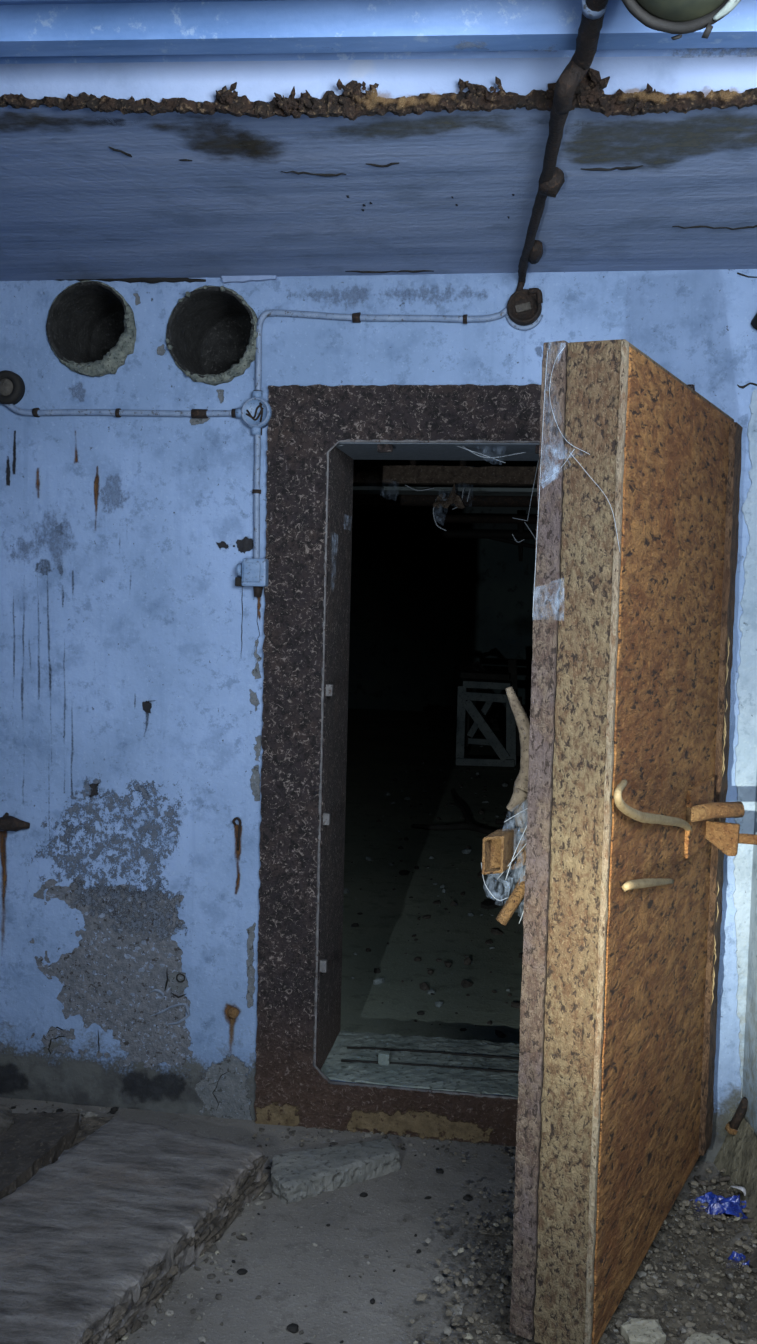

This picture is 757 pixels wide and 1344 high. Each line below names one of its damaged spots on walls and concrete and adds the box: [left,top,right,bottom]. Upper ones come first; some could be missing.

rust [0,77,556,121]
rust [570,68,757,117]
water stain [153,117,279,159]
water stain [567,115,757,168]
rust [6,431,16,486]
peeling [249,639,262,711]
peeling [250,735,261,801]
rust [234,824,242,894]
spalling [26,773,193,1070]
water stain [0,1064,28,1094]
water stain [123,1072,185,1103]
spalling [195,1054,253,1120]